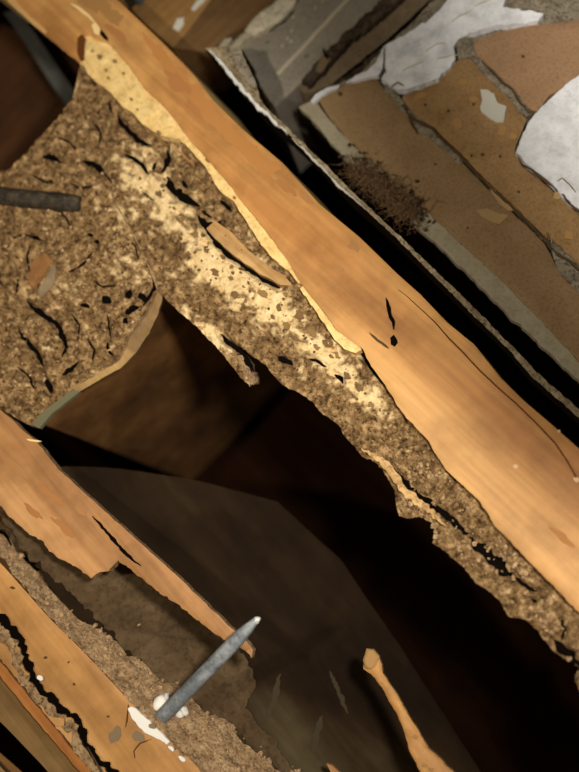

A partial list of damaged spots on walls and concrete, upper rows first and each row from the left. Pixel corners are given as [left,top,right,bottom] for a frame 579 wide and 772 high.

crack [383,46,404,88]
crack [482,62,530,114]
crack [83,160,104,173]
crack [401,105,579,271]
crack [361,290,579,482]
crack [92,516,141,566]
crack [0,613,120,772]